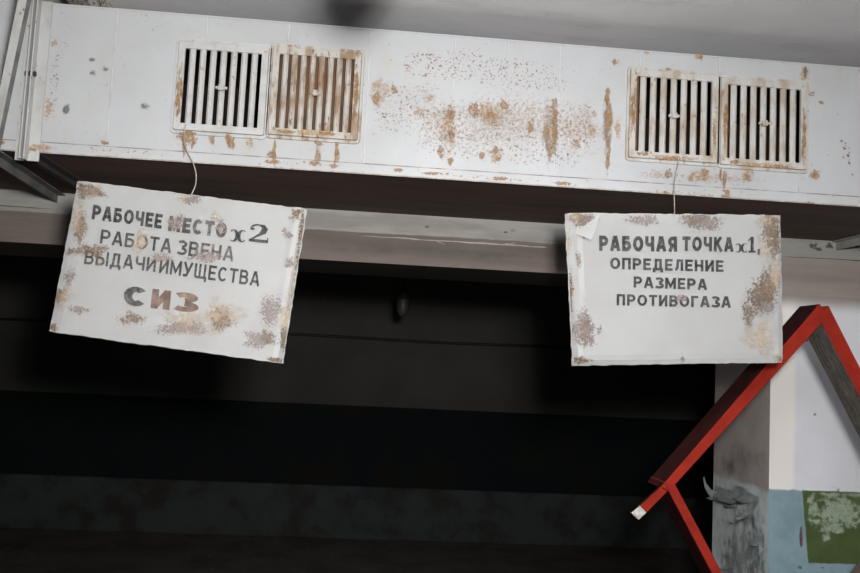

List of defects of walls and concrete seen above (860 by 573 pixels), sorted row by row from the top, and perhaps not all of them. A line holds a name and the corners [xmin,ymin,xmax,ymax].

corrosion [175,77,183,115]
corrosion [373,51,563,132]
corrosion [176,131,198,155]
corrosion [265,129,340,168]
corrosion [424,88,620,177]
corrosion [689,160,787,198]
peeling [803,489,860,542]